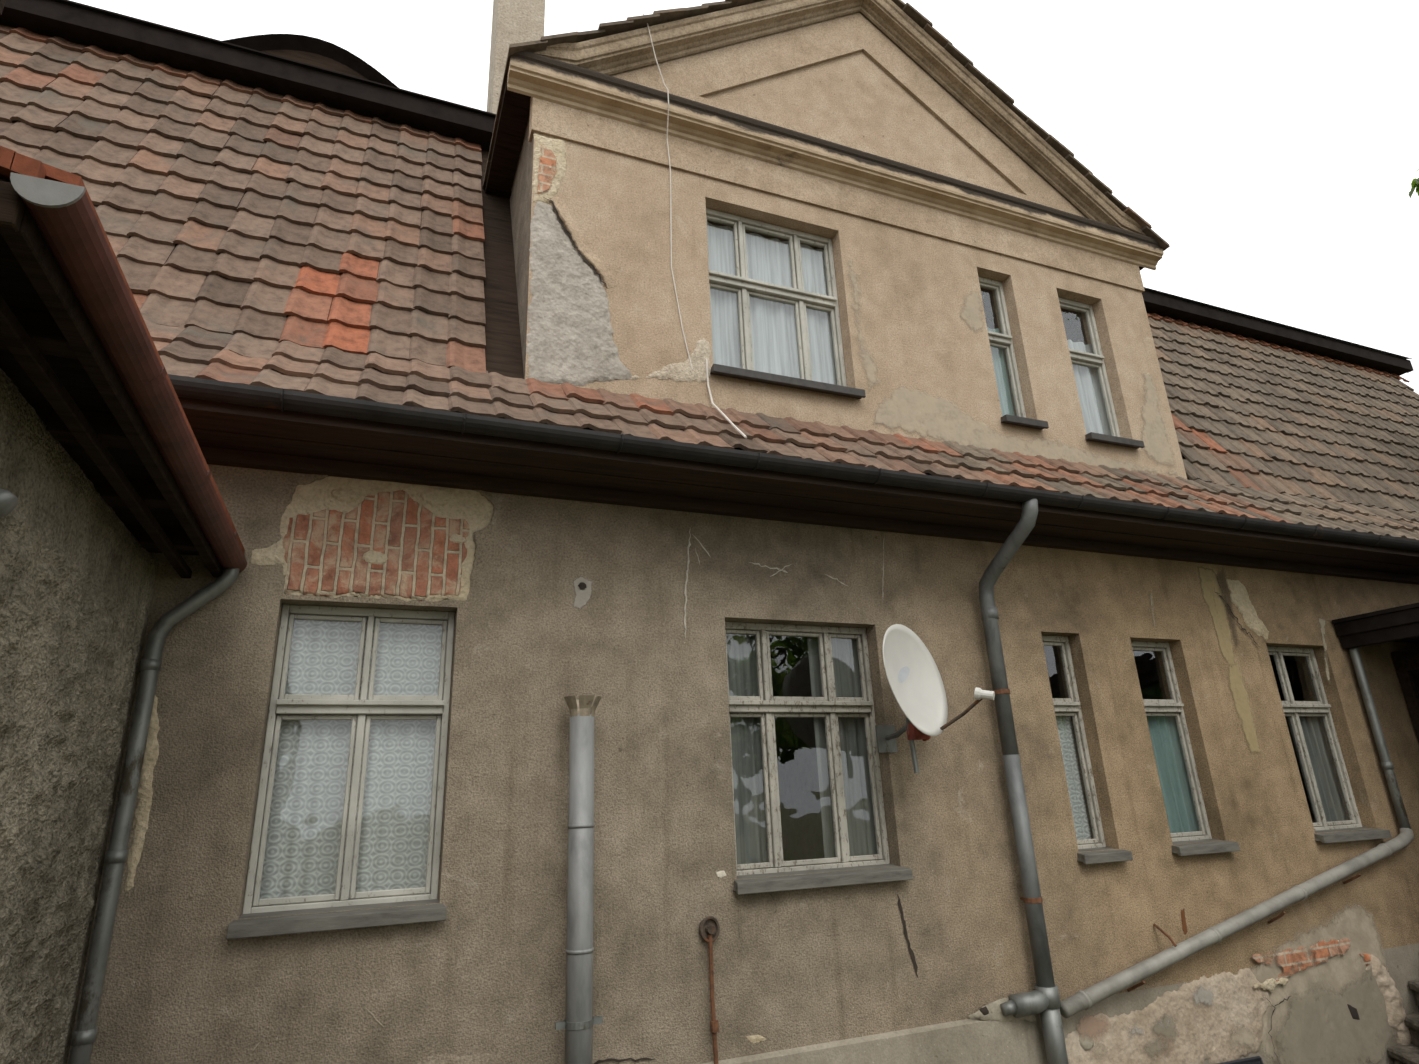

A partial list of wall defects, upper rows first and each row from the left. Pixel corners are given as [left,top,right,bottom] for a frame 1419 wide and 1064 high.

spalling [526,133,712,386]
spalling [251,474,503,602]
spalling [1065,906,1388,1064]